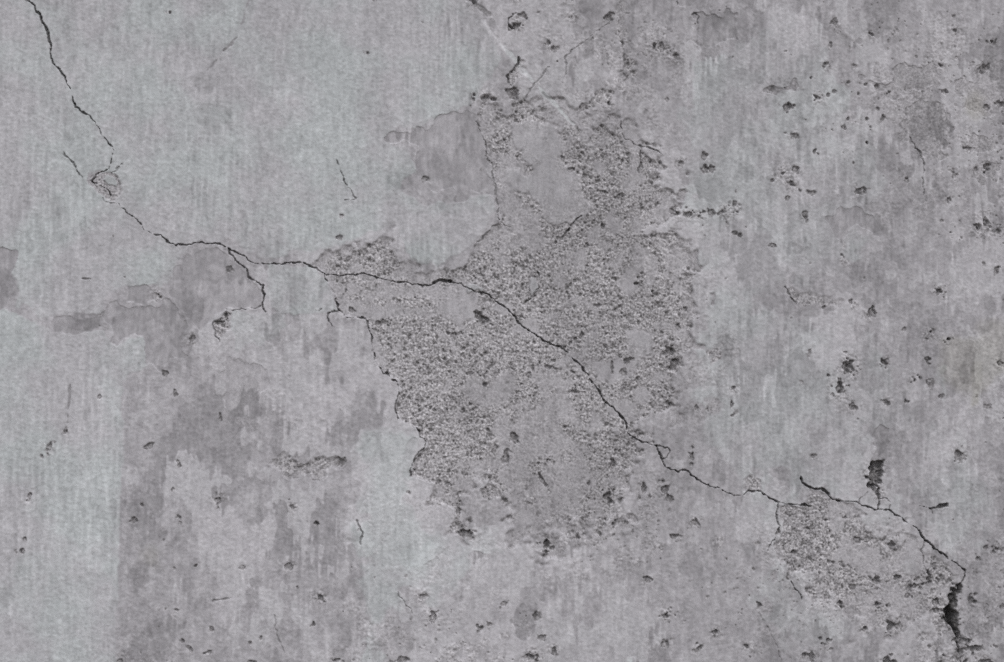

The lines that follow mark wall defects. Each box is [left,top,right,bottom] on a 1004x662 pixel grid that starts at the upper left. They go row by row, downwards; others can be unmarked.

spalling [465,0,493,19]
spalling [507,0,540,32]
spalling [603,0,678,83]
peeling [691,8,739,50]
crack [909,134,926,196]
crack [25,0,812,552]
spalling [309,56,743,584]
crack [800,476,967,662]
spalling [770,424,1004,662]
crack [274,615,286,654]
spalling [692,629,719,655]